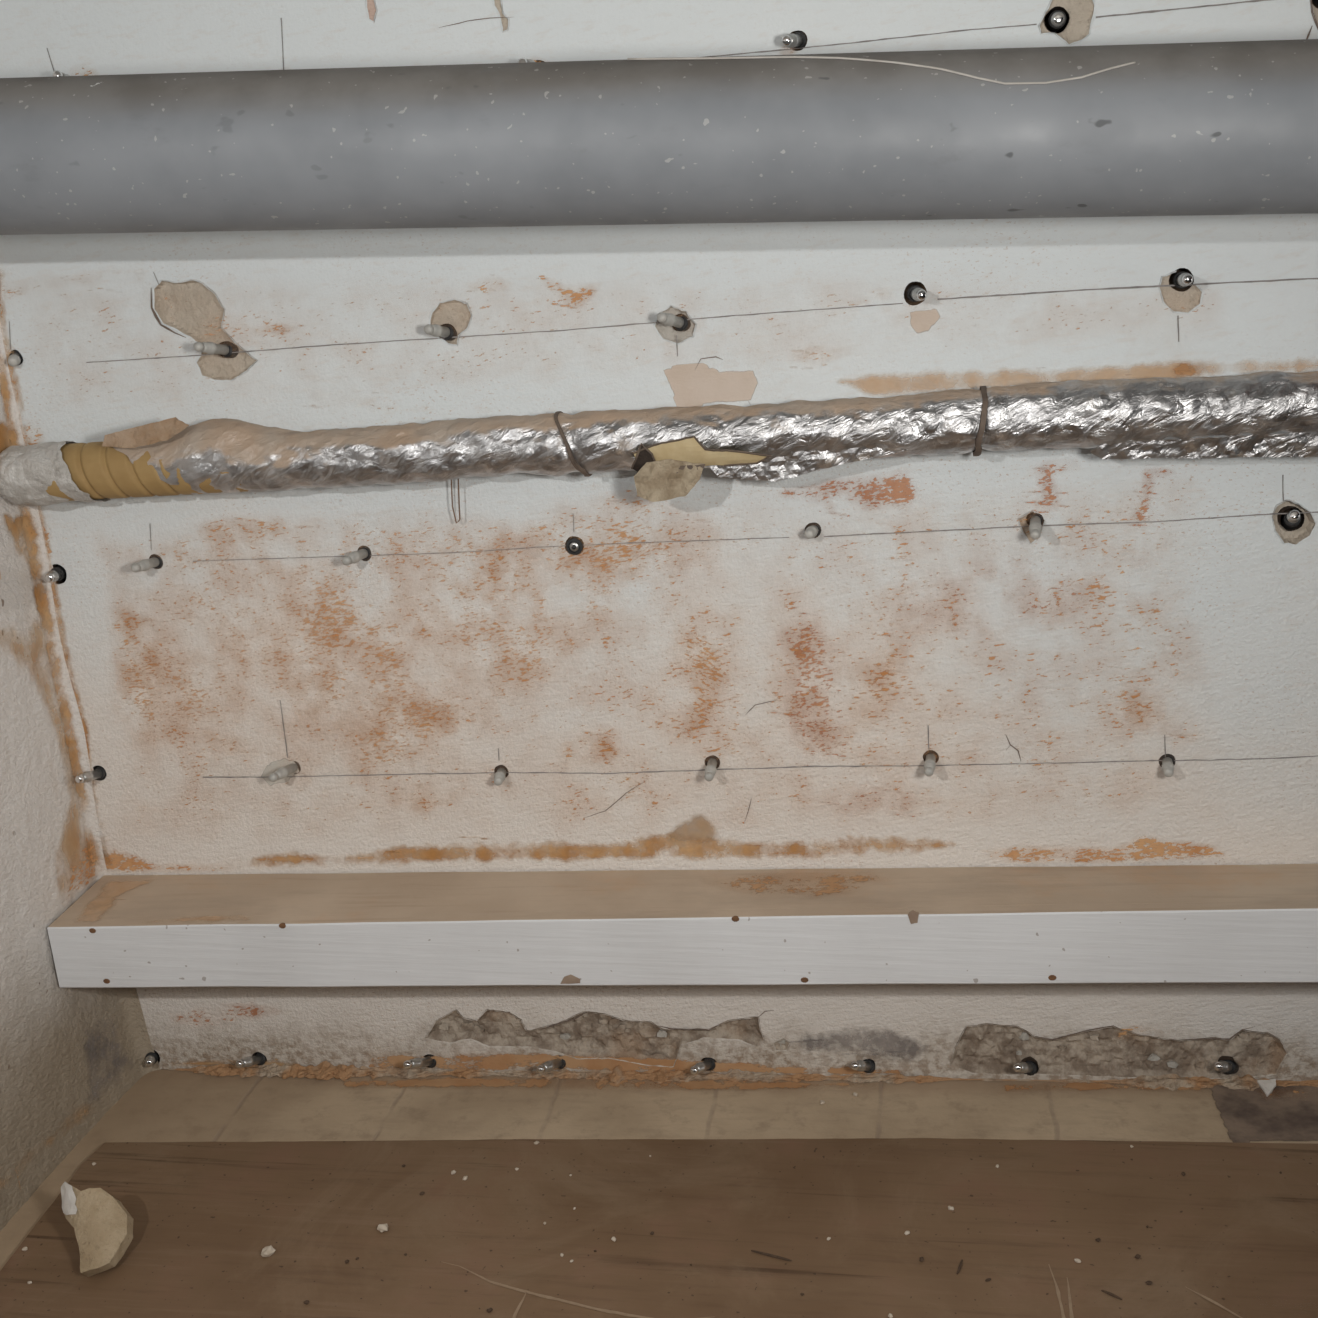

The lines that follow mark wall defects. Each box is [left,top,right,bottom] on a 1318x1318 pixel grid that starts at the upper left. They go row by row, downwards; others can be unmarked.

spalling [152,279,258,382]
corrosion [0,352,43,453]
corrosion [782,474,915,516]
corrosion [4,509,89,799]
corrosion [111,490,770,820]
corrosion [757,525,985,817]
corrosion [979,464,1191,748]
corrosion [66,838,222,900]
corrosion [358,836,943,862]
corrosion [991,838,1222,863]
spalling [425,1009,790,1067]
spalling [950,1023,1288,1097]